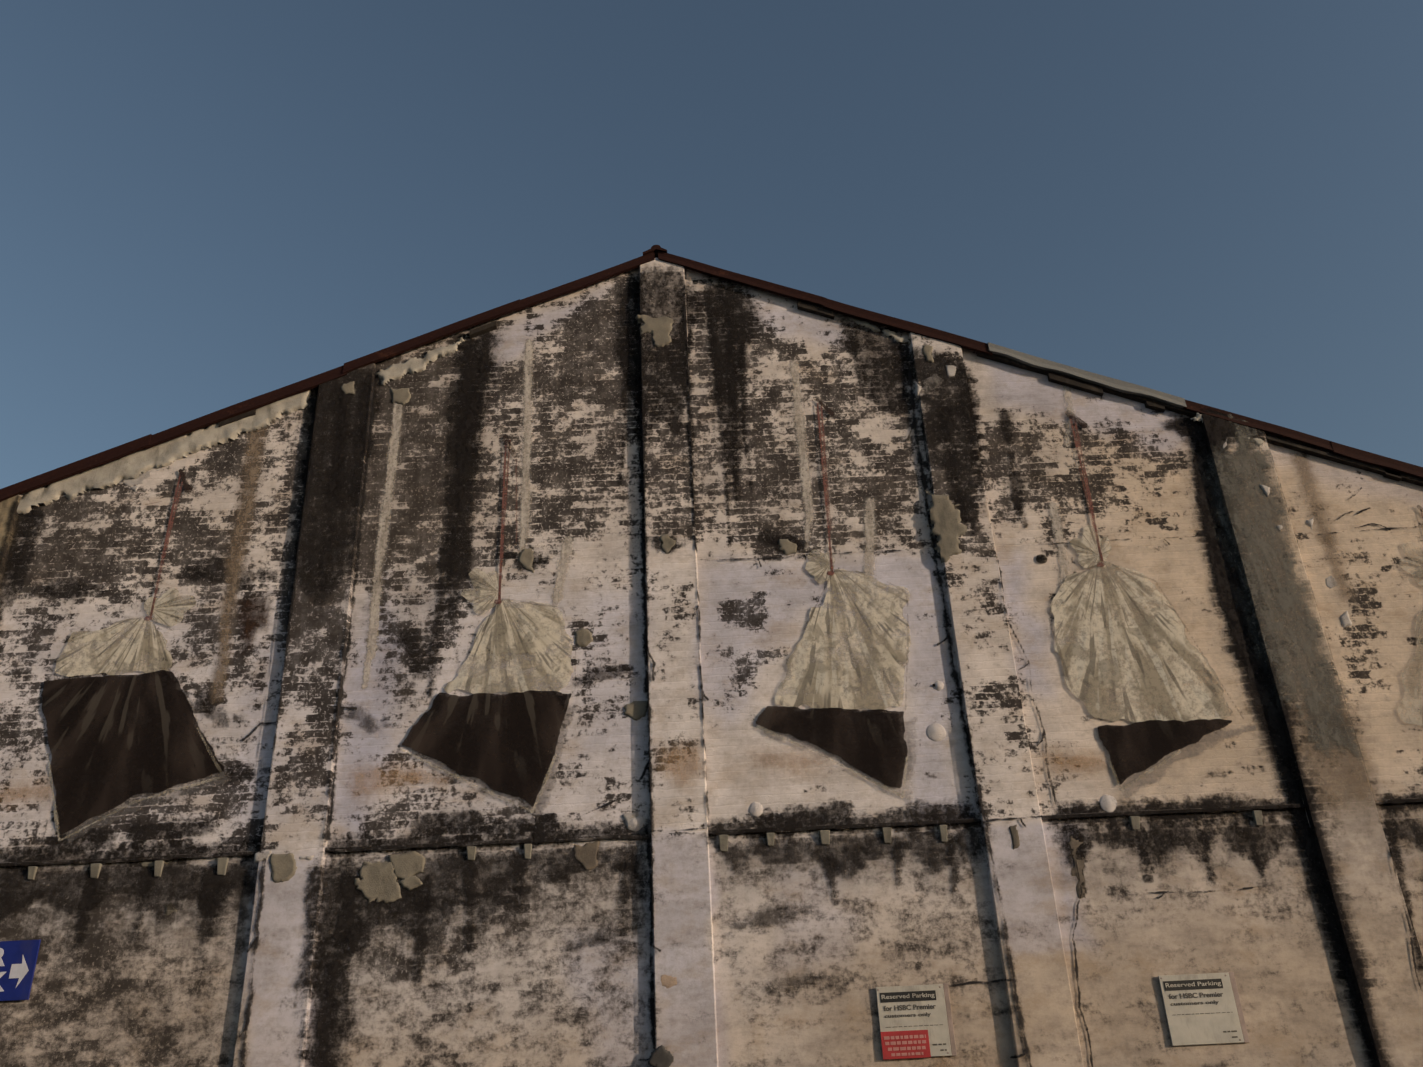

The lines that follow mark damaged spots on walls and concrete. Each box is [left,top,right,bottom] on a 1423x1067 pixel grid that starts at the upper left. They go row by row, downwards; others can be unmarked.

leakage [288,369,403,689]
leakage [397,332,501,697]
leakage [613,267,761,606]
leakage [840,318,985,536]
peeling [913,365,956,397]
leakage [999,410,1028,528]
leakage [1049,409,1423,1067]
leakage [0,819,265,960]
mould [734,907,812,929]
leakage [708,800,988,905]
crack [1072,861,1093,1067]
crack [1120,887,1254,899]